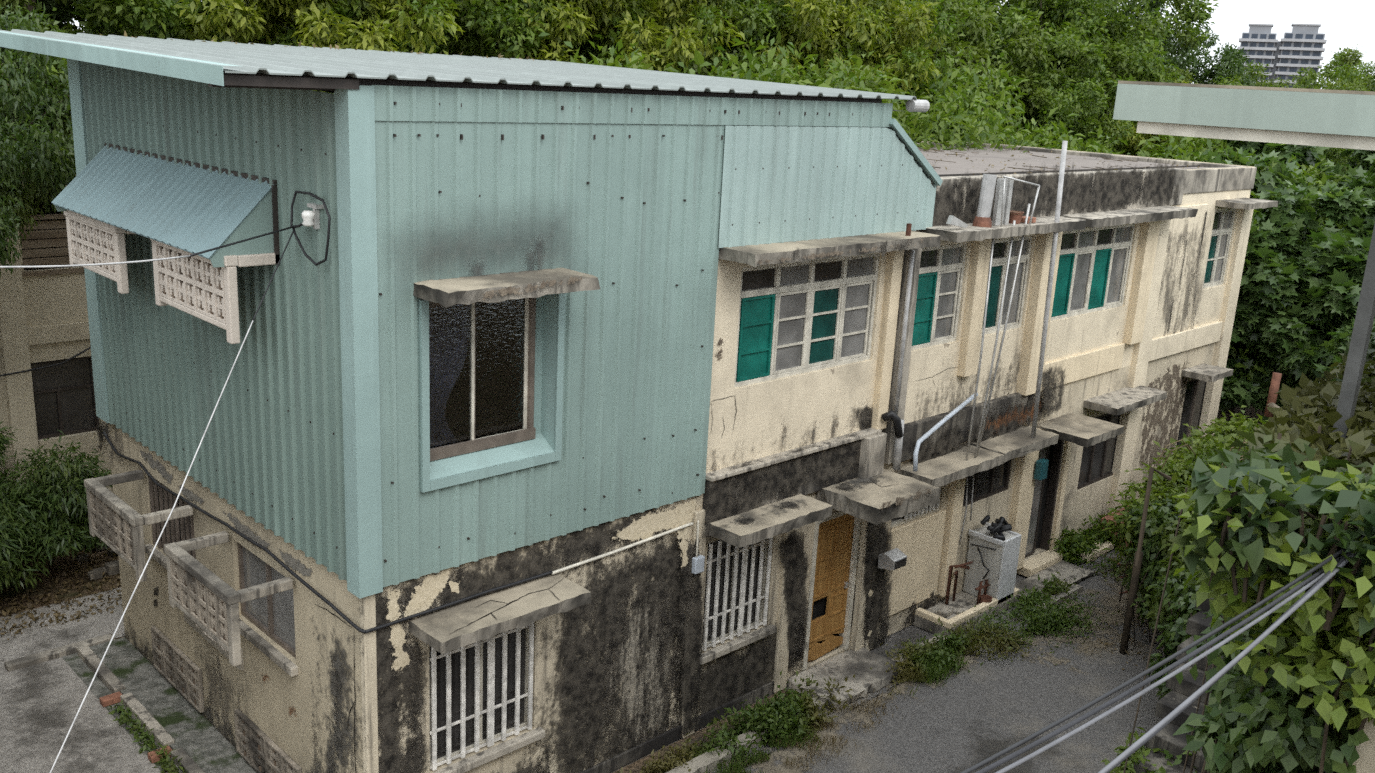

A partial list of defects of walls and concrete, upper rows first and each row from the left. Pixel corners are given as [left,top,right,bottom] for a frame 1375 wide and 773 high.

damp [932,162,1178,226]
damp [1160,212,1211,334]
damp [308,406,884,773]
damp [851,522,893,650]